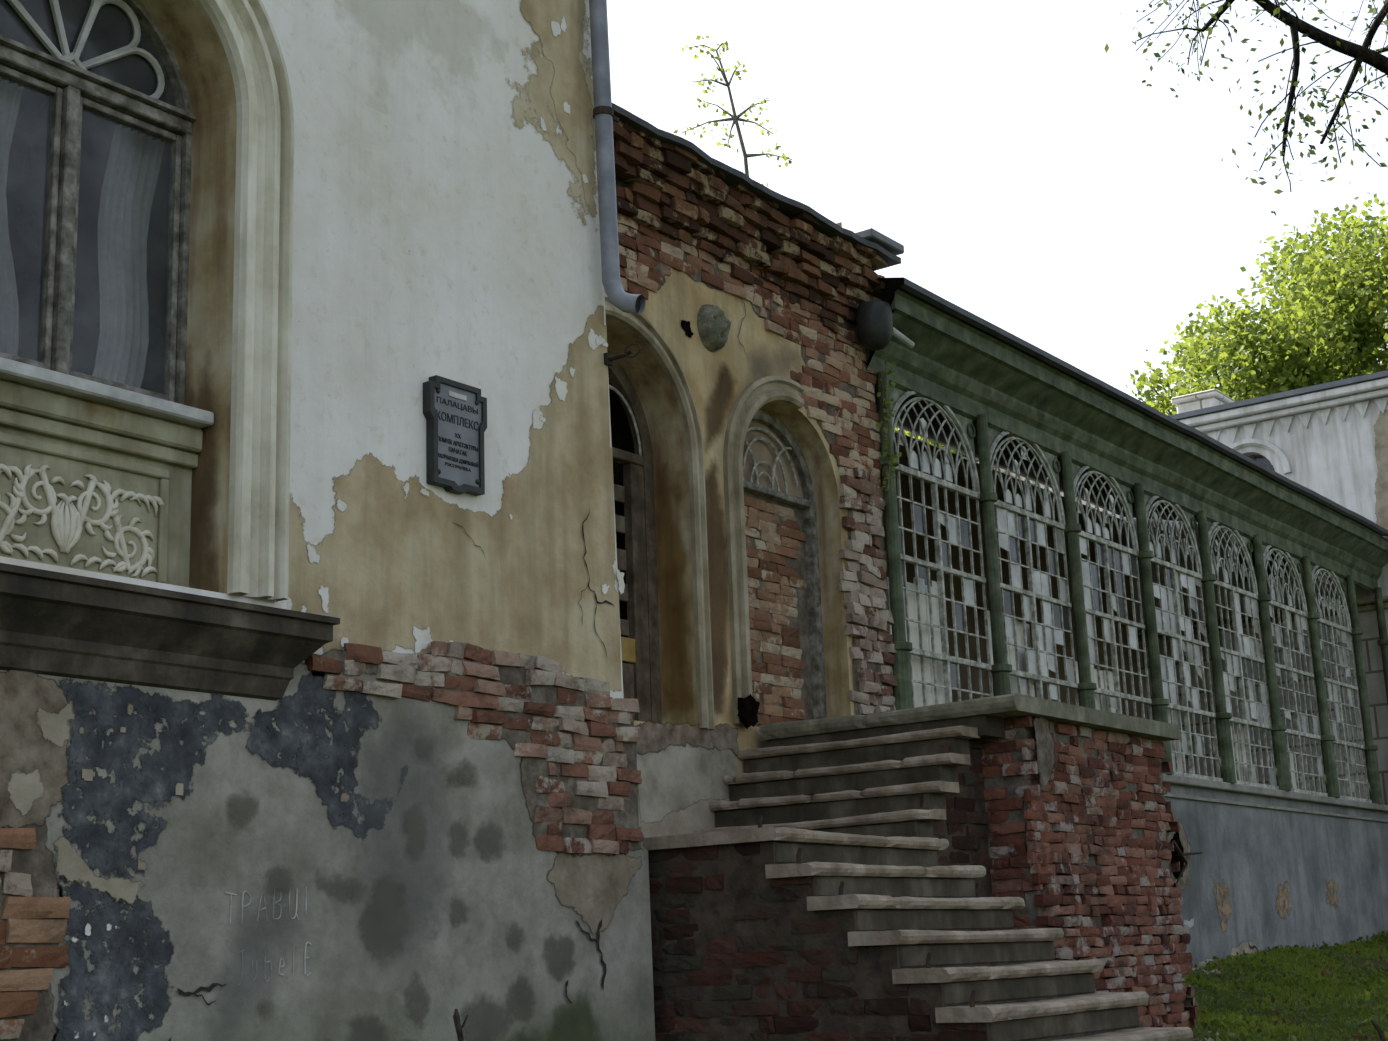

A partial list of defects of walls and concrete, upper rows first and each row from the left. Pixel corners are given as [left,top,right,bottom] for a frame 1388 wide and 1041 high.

flaking render [508,0,597,225]
flaking render [613,120,897,716]
crack [578,511,613,656]
flaking render [0,289,738,1041]
flaking render [737,694,760,730]
water stain [230,797,257,824]
water stain [451,823,503,860]
hole [1168,821,1202,890]
water stain [319,878,408,955]
water stain [545,936,575,980]
crack [576,920,606,991]
water stain [463,979,534,1041]